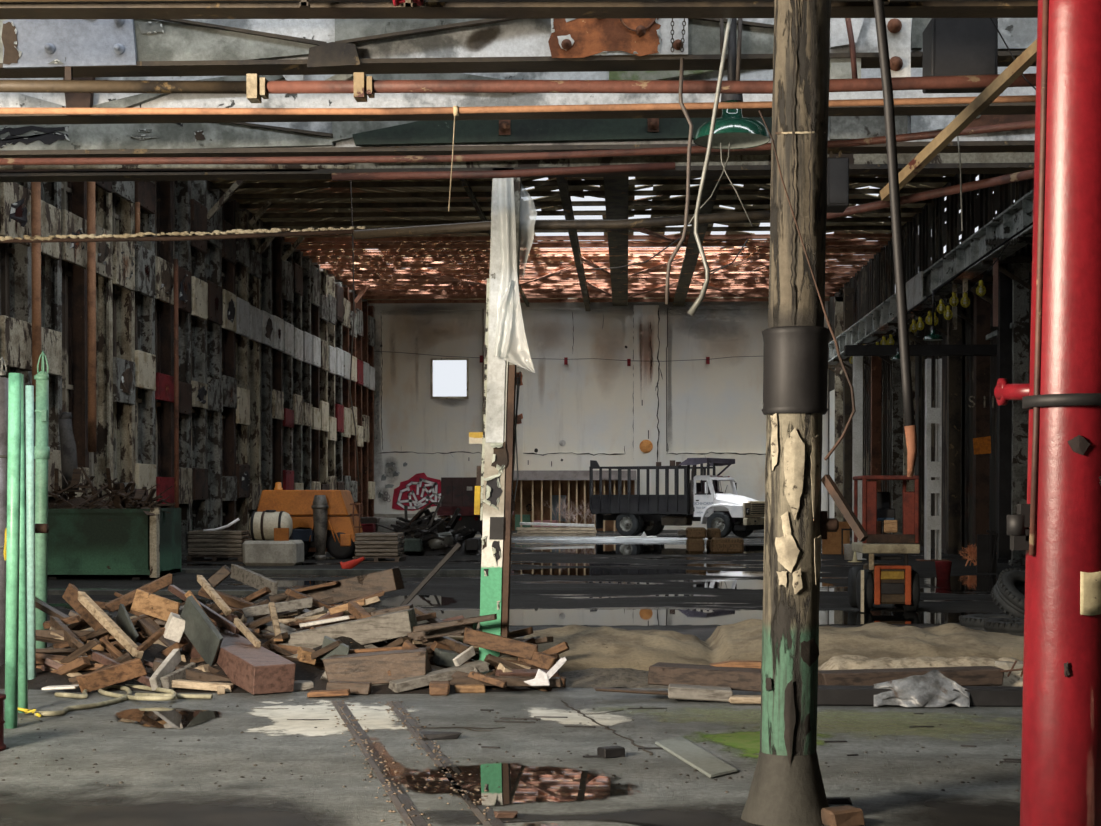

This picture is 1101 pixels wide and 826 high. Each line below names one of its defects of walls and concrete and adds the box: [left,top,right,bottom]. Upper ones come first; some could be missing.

peeling [1,22,22,65]
peeling [137,21,165,34]
rust [548,18,662,58]
peeling [0,126,70,148]
peeling [176,123,205,141]
peeling [9,198,30,227]
peeling [98,242,135,279]
peeling [227,300,235,323]
peeling [120,368,133,395]
peeling [770,413,820,594]
peeling [800,638,819,667]
peeling [784,680,811,767]